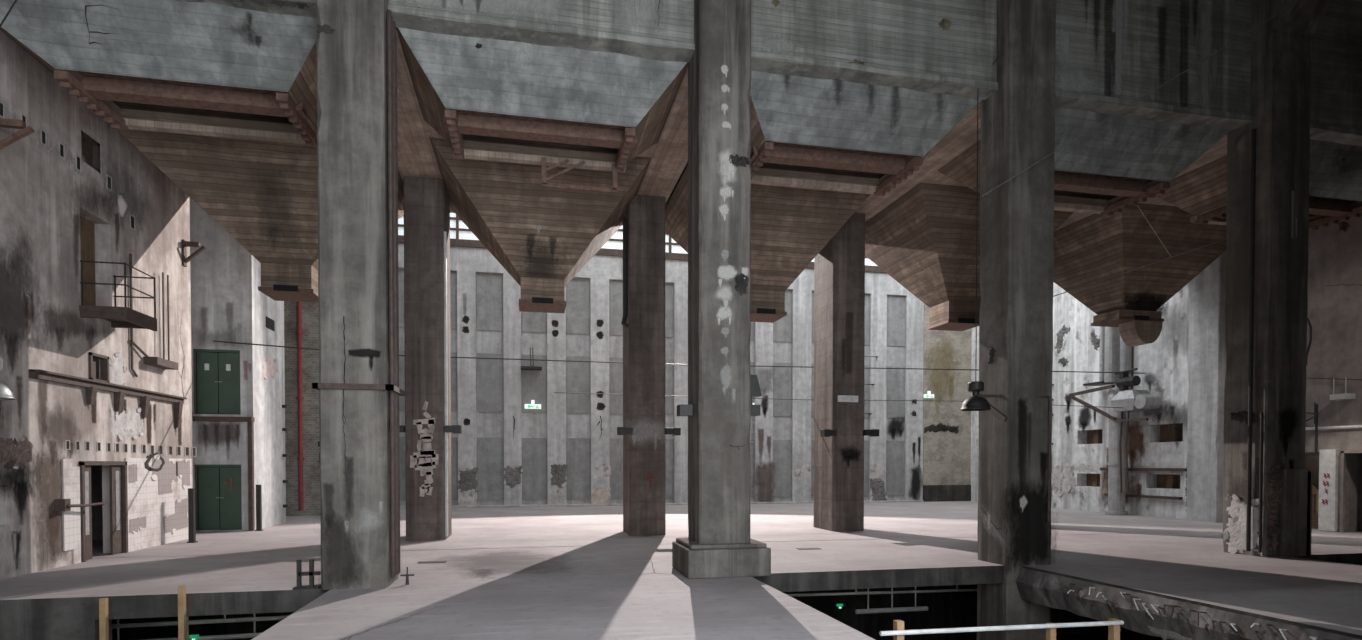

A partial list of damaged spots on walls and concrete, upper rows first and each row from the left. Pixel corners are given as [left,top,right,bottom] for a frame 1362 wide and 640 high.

water stain [1060,0,1127,96]
spalling [735,273,749,296]
water stain [7,338,22,416]
water stain [39,382,75,461]
water stain [12,481,27,566]
peeling [1221,494,1263,556]